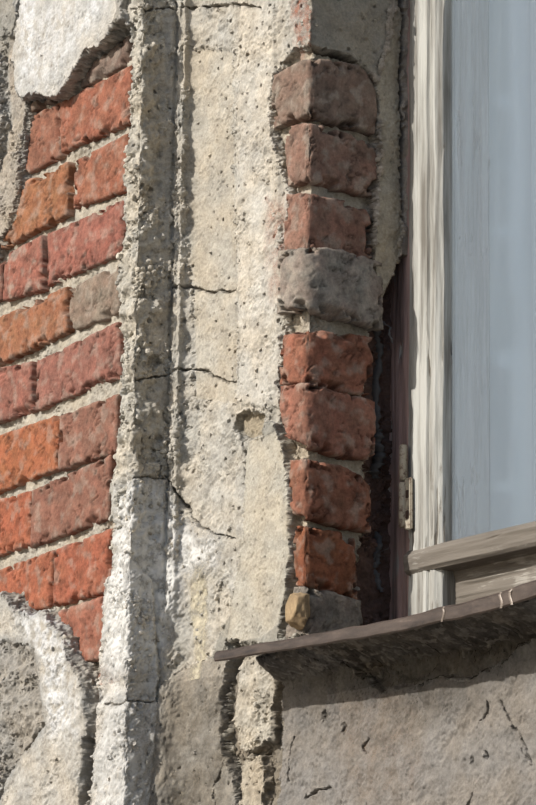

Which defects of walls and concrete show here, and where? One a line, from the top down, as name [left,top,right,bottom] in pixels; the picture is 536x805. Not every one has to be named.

crack [132,2,262,12]
crack [173,283,237,294]
crack [136,366,239,383]
spalling [0,0,393,805]
crack [132,473,235,538]
spalling [266,602,536,689]